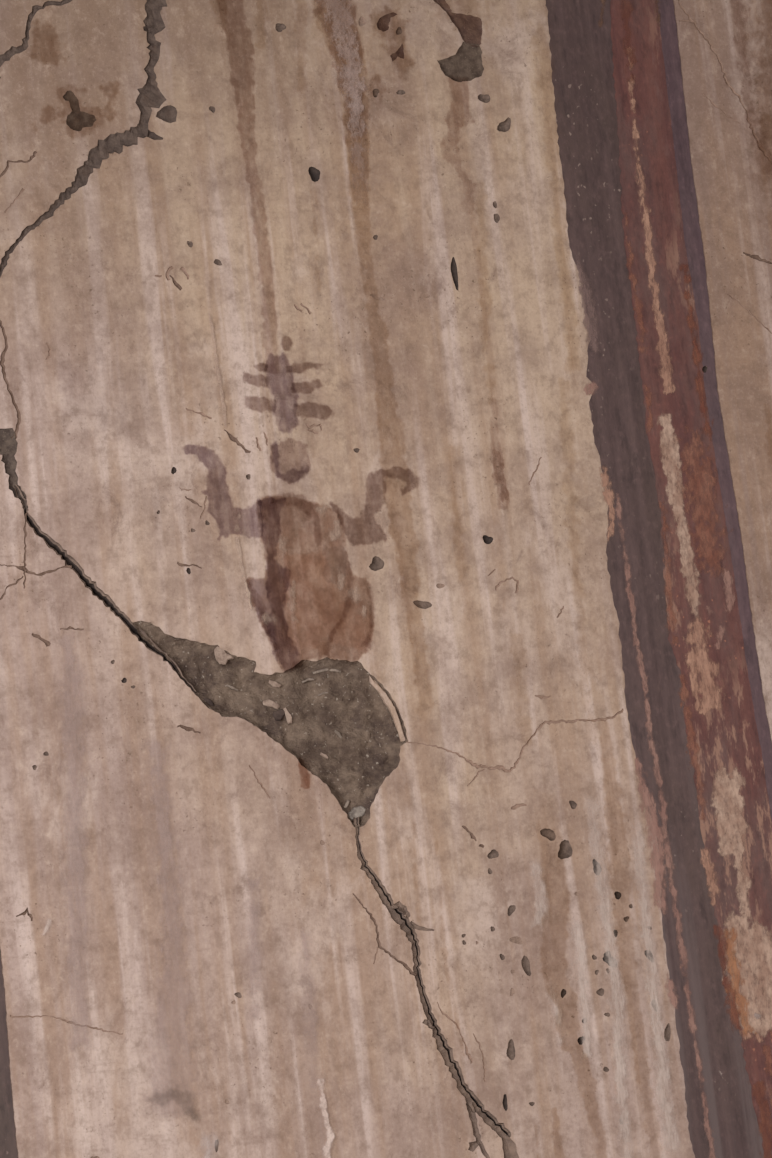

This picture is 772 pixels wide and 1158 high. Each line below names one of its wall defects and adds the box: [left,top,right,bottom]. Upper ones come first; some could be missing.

flaking render [358,12,404,61]
flaking render [434,0,484,82]
crack [0,0,167,277]
crack [155,266,189,290]
crack [186,408,268,453]
crack [0,320,196,692]
crack [180,488,207,519]
crack [177,725,201,733]
flaking render [132,621,408,827]
crack [353,817,519,1158]